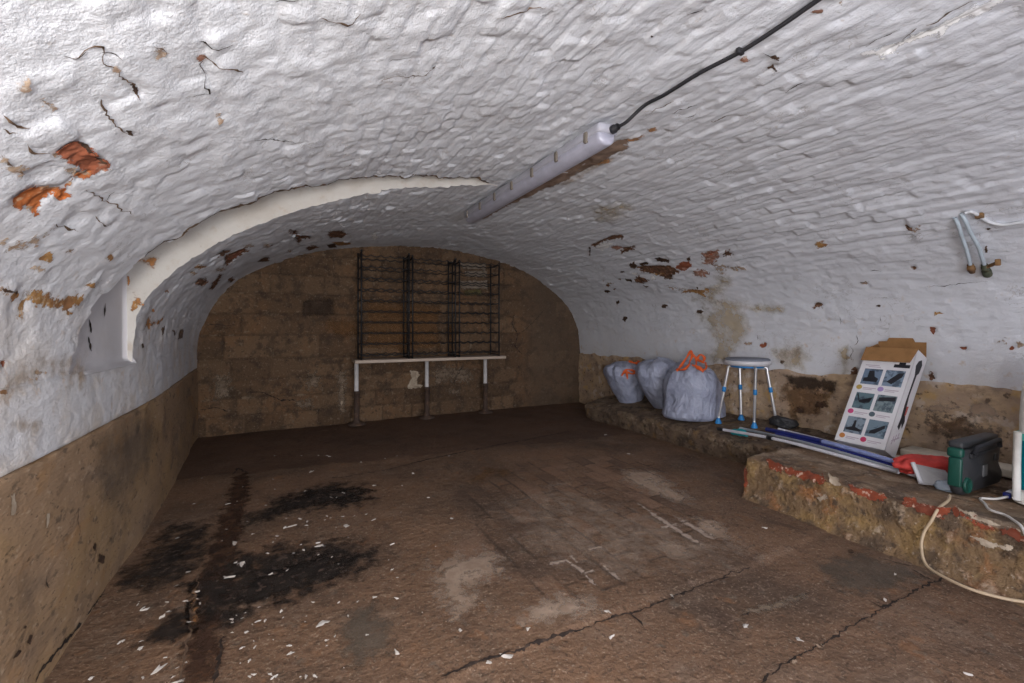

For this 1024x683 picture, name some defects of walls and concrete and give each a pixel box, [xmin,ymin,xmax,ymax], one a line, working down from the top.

crack [65,45,140,100]
crack [186,41,242,98]
peeling [0,156,30,177]
spalling [12,141,111,217]
spalling [190,244,273,290]
spalling [287,230,352,253]
spalling [588,235,746,305]
peeling [0,283,96,318]
water stain [782,354,837,420]
crack [443,567,750,676]
crack [741,592,812,616]
crack [761,559,942,683]